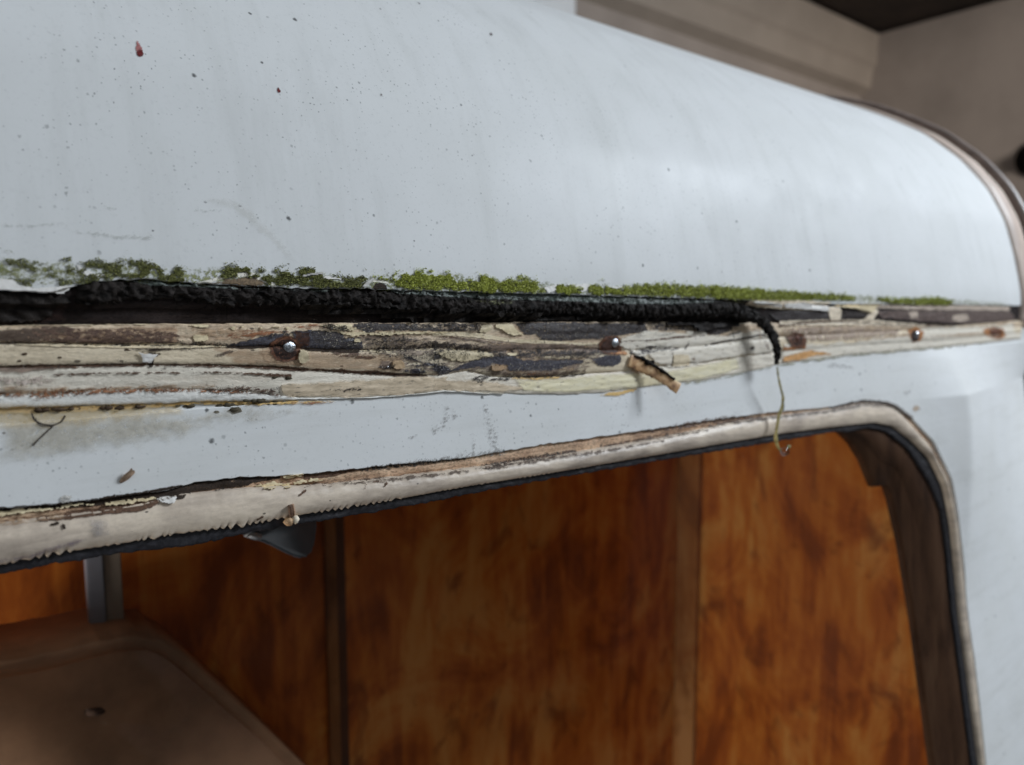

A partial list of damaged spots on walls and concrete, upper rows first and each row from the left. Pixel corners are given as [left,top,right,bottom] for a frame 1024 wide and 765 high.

damp [392,289,714,305]
peeling [16,324,227,348]
rust [192,324,317,366]
peeling [320,324,598,362]
rust [859,326,1005,343]
peeling [298,349,309,363]
spalling [619,329,773,393]
peeling [255,474,323,489]
peeling [0,496,177,517]